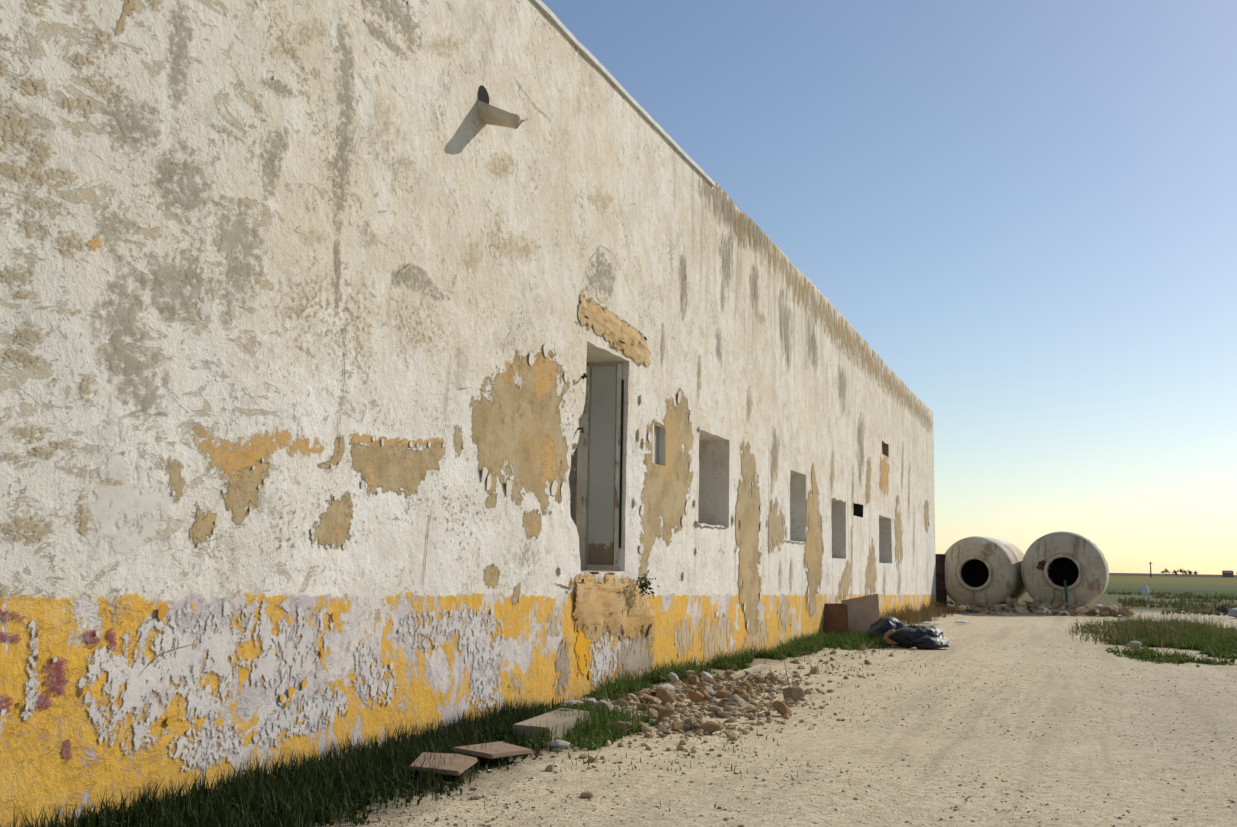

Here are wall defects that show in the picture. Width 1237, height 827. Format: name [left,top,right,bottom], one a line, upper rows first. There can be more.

flaking render [577,294,651,367]
flaking render [166,456,270,547]
flaking render [273,343,577,562]
flaking render [548,388,700,696]
flaking render [675,436,824,664]
water stain [772,429,780,482]
flaking render [836,540,877,602]
peeling [0,620,58,721]